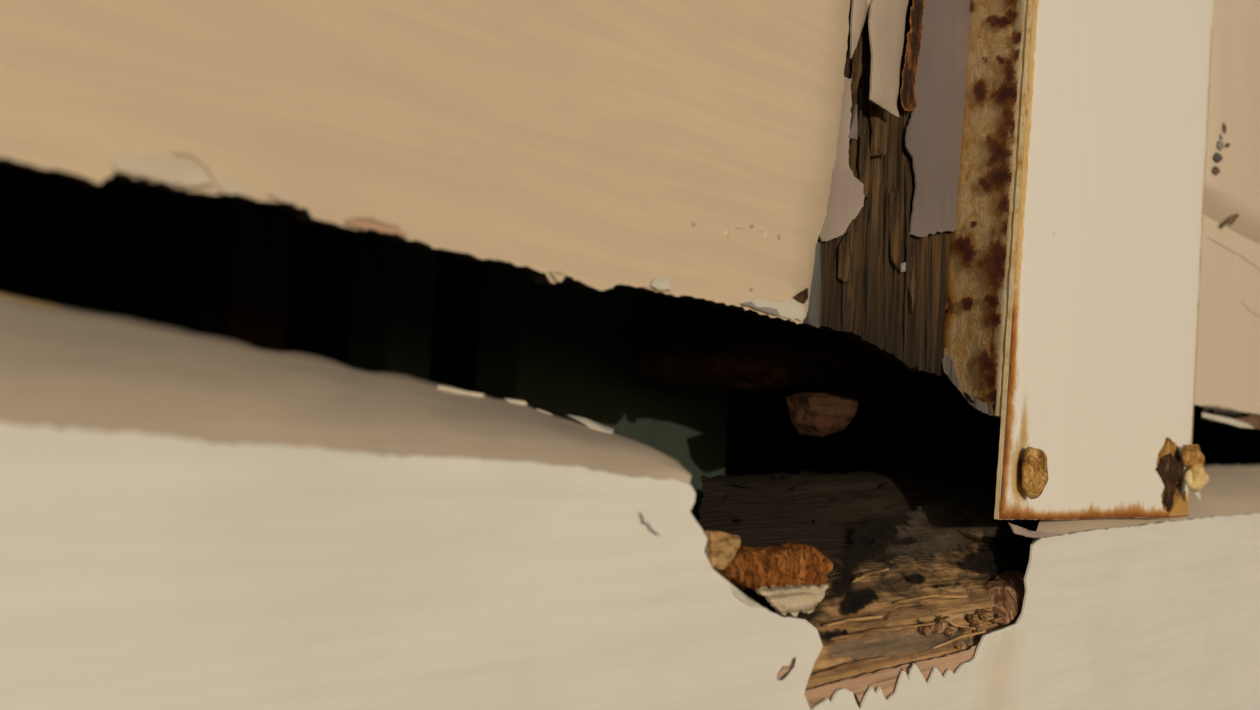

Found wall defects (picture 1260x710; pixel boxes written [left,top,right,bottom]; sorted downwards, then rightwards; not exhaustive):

peeling [850,0,971,238]
peeling [111,153,250,197]
peeling [344,217,407,237]
peeling [741,77,865,328]
peeling [650,276,671,291]
corrosion [943,0,1190,519]
peeling [437,385,484,397]
peeling [504,398,553,415]
peeling [568,415,613,434]
peeling [942,354,996,417]
spalling [962,523,1061,577]
spalling [824,516,918,643]